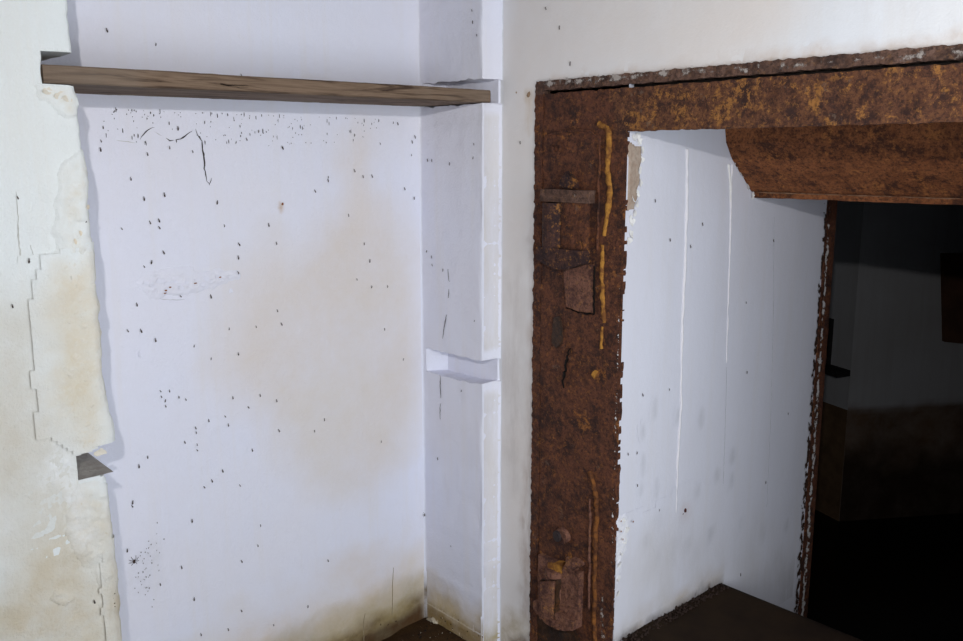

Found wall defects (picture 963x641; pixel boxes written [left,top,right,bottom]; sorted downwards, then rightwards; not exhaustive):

crack [117,127,212,183]
corrosion [523,187,535,284]
water stain [503,0,824,265]
corrosion [516,20,963,139]
water stain [0,242,172,641]
water stain [167,104,530,641]
corrosion [513,474,532,613]
corrosion [794,209,827,614]